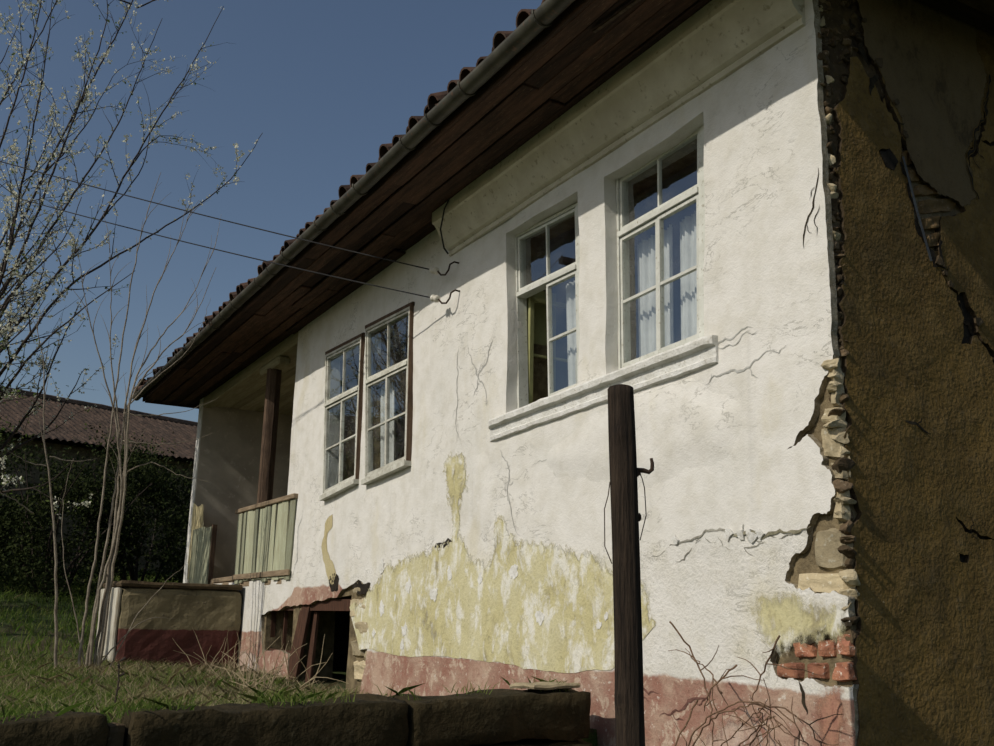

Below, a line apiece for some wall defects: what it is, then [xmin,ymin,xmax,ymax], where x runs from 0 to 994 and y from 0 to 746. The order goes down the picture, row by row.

crack [840,0,909,139]
crack [803,170,819,247]
crack [706,326,785,385]
peeling [770,0,991,746]
crack [649,526,811,562]
crack [958,518,989,540]
damp [756,594,845,651]